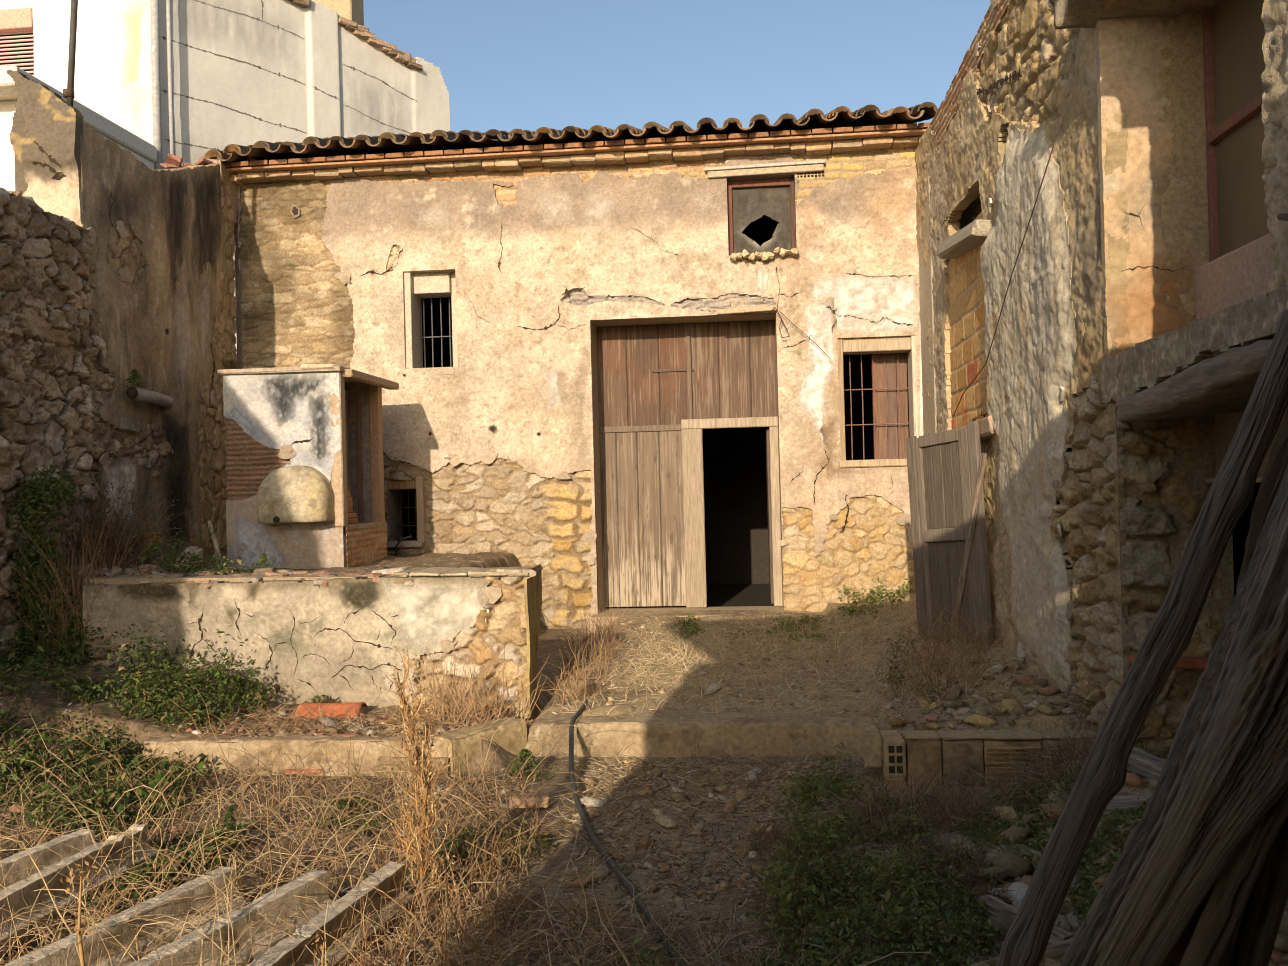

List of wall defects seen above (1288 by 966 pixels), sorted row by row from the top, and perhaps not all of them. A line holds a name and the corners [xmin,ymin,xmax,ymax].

spalling [355,157,730,207]
damp [169,181,216,378]
spalling [160,153,355,569]
damp [268,378,325,459]
crack [784,305,912,348]
crack [845,271,912,279]
damp [165,417,187,539]
crack [188,600,401,693]
spalling [383,450,599,728]
spalling [778,495,916,612]
spalling [1048,373,1130,735]